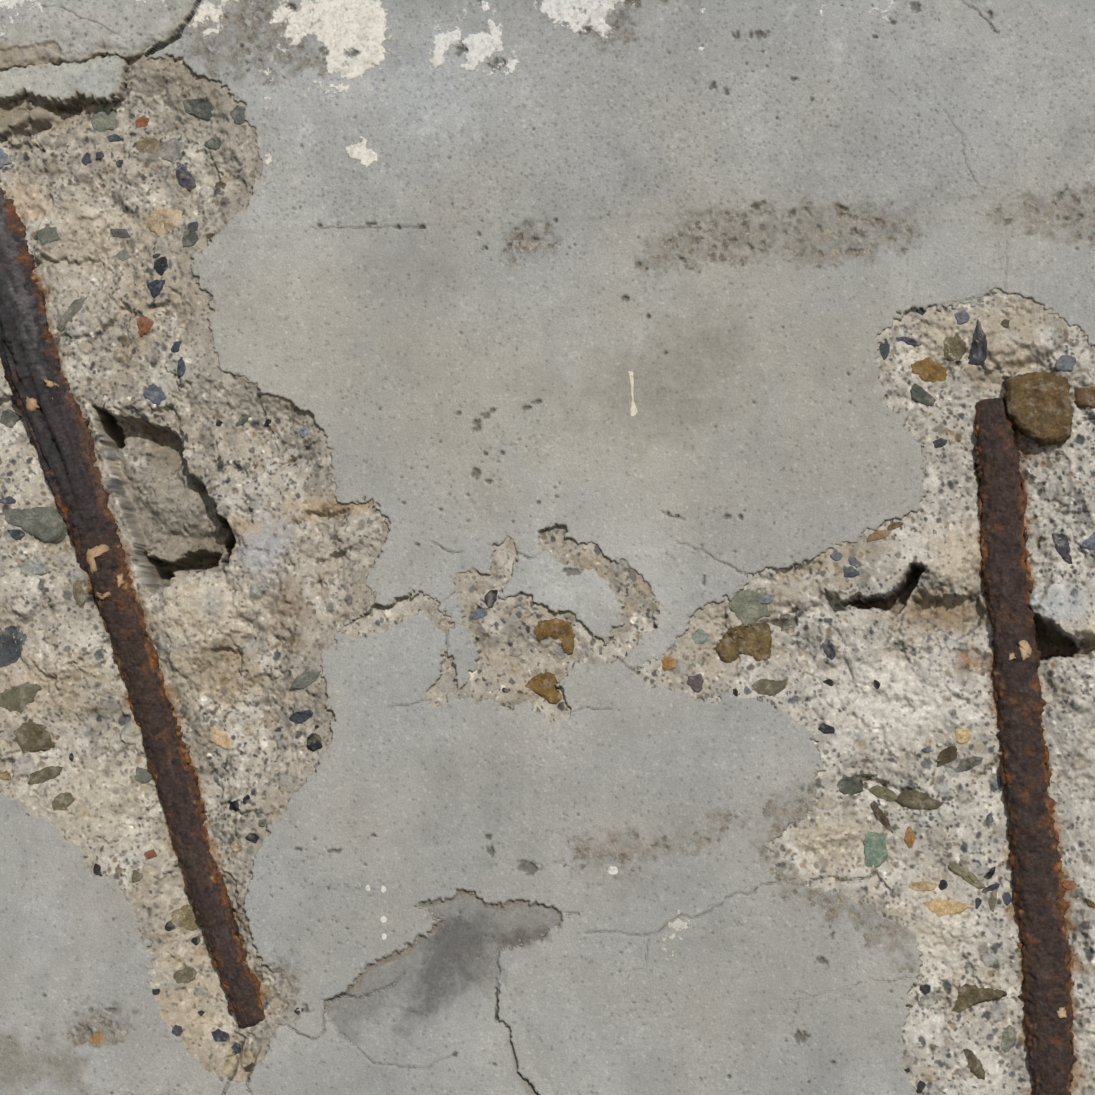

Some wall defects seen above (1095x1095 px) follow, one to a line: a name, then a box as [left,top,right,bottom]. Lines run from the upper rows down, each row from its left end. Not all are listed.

crack [146,0,200,57]
spalling [0,0,660,1081]
spalling [632,288,1095,1095]
rust [1010,906,1026,1006]
crack [279,978,399,1038]
crack [493,990,501,1019]
crack [223,1041,259,1093]